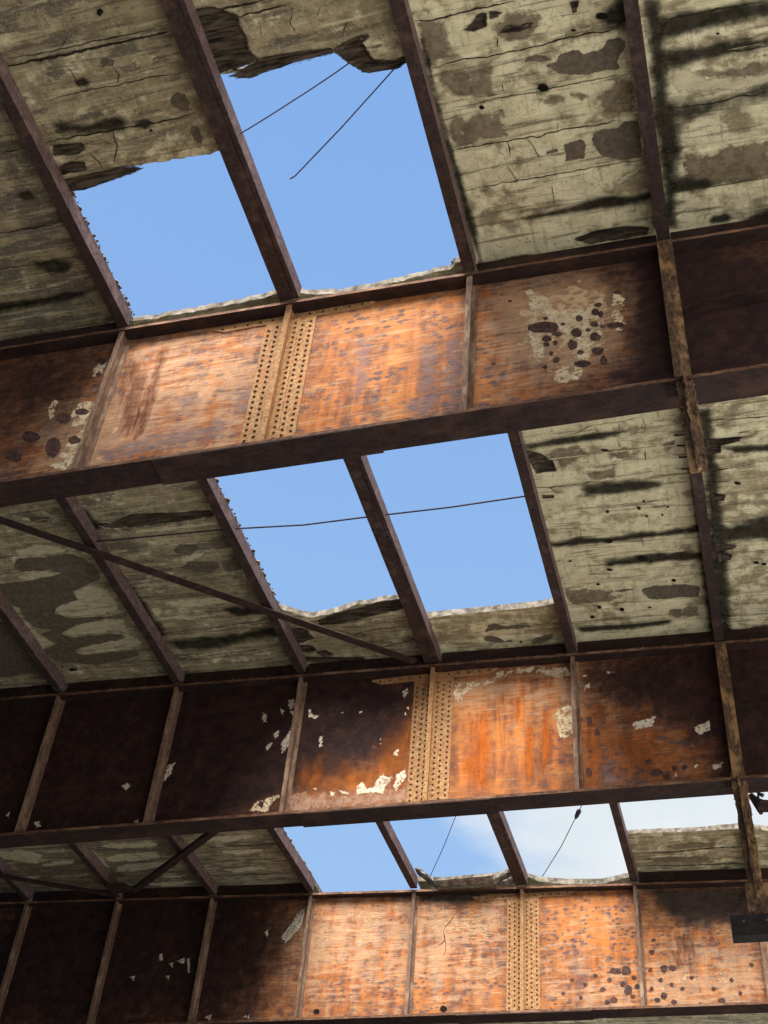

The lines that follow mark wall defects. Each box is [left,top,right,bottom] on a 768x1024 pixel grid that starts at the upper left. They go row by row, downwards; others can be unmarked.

water stain [645,0,768,228]
spalling [52,142,143,192]
water stain [529,192,651,218]
peeling [525,289,625,383]
corrosion [527,302,625,369]
corrosion [5,431,81,461]
corrosion [56,408,90,424]
water stain [525,431,625,448]
water stain [551,409,768,642]
spalling [318,600,403,625]
peeling [330,770,407,796]
corrosion [561,936,695,1005]